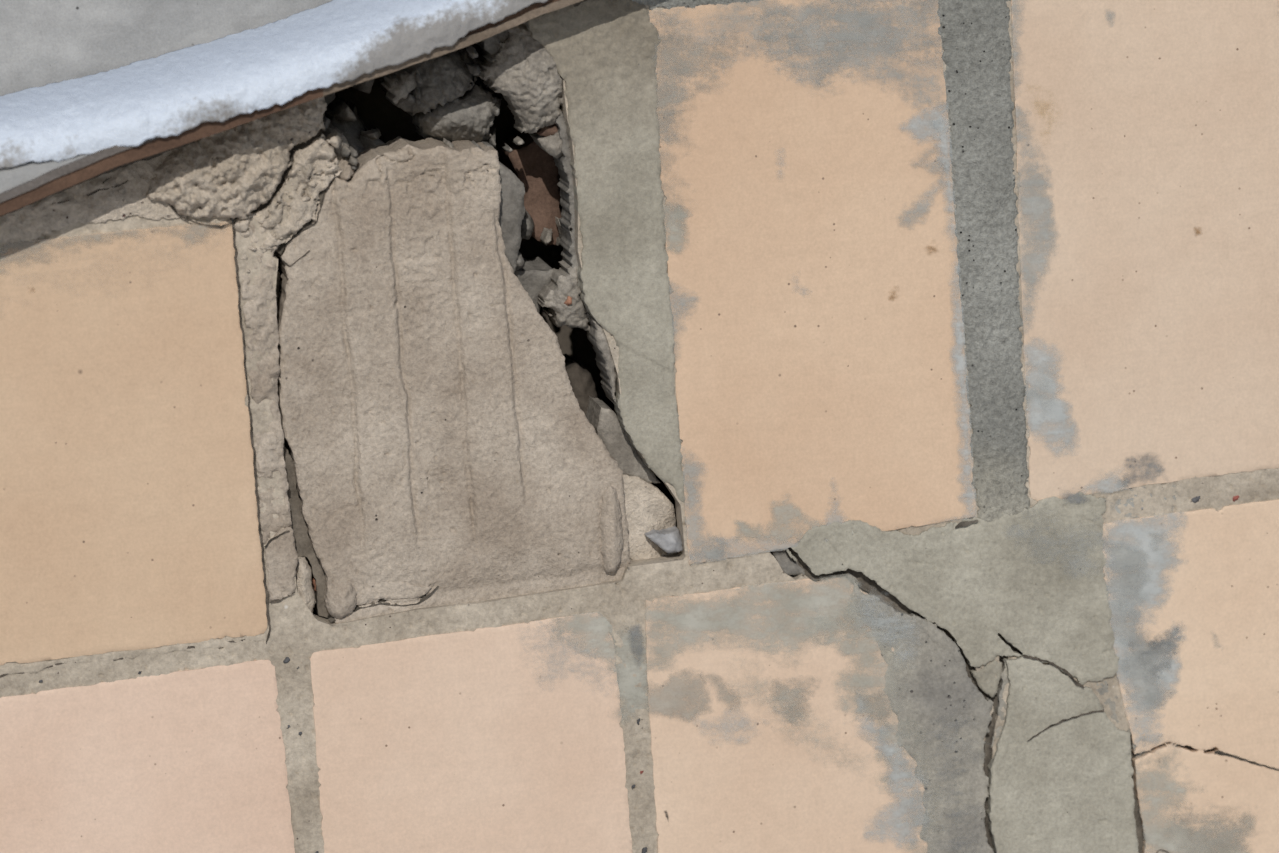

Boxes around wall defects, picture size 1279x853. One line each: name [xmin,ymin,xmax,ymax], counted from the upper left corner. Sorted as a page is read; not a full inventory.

water stain [657,0,955,231]
spalling [230,30,678,630]
water stain [953,301,975,513]
crack [955,520,978,528]
water stain [559,575,929,848]
crack [786,548,1104,848]
crack [1131,744,1279,853]